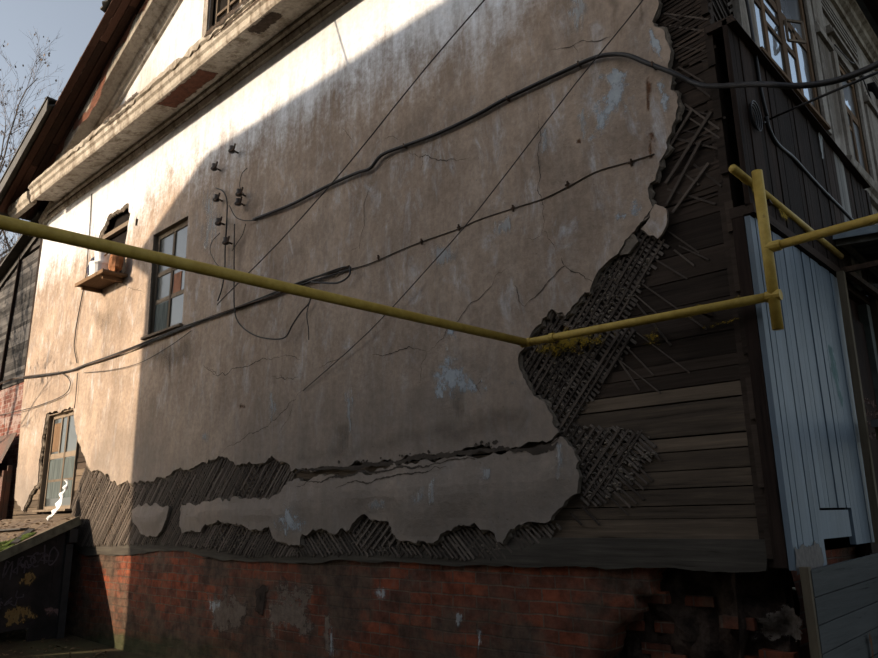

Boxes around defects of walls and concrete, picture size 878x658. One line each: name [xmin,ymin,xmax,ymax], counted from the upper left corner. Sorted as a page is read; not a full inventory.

flaking render [100,203,138,238]
crack [374,114,591,381]
flaking render [519,0,734,526]
crack [203,355,305,449]
peeling [435,358,486,398]
flaking render [23,414,50,513]
flaking render [71,441,562,561]
spalling [613,567,805,658]